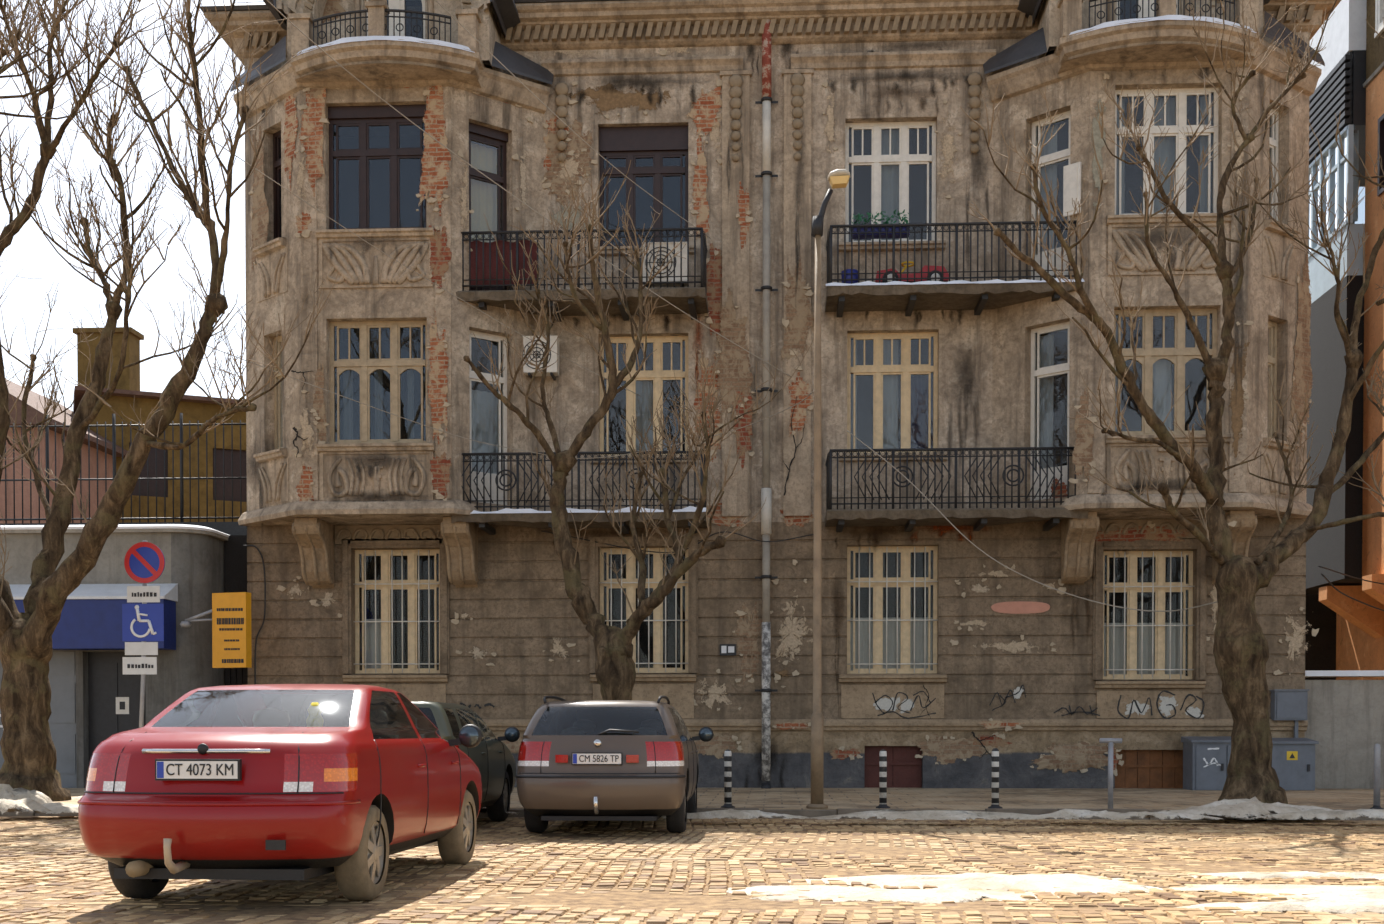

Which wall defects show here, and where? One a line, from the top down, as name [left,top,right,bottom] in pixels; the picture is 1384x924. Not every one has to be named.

flaking render [294,211,312,238]
flaking render [283,87,340,197]
flaking render [396,85,474,294]
flaking render [511,81,672,230]
flaking render [686,79,758,468]
flaking render [426,311,452,501]
flaking render [1273,607,1319,676]
flaking render [915,718,1028,765]
flaking render [1029,741,1124,776]